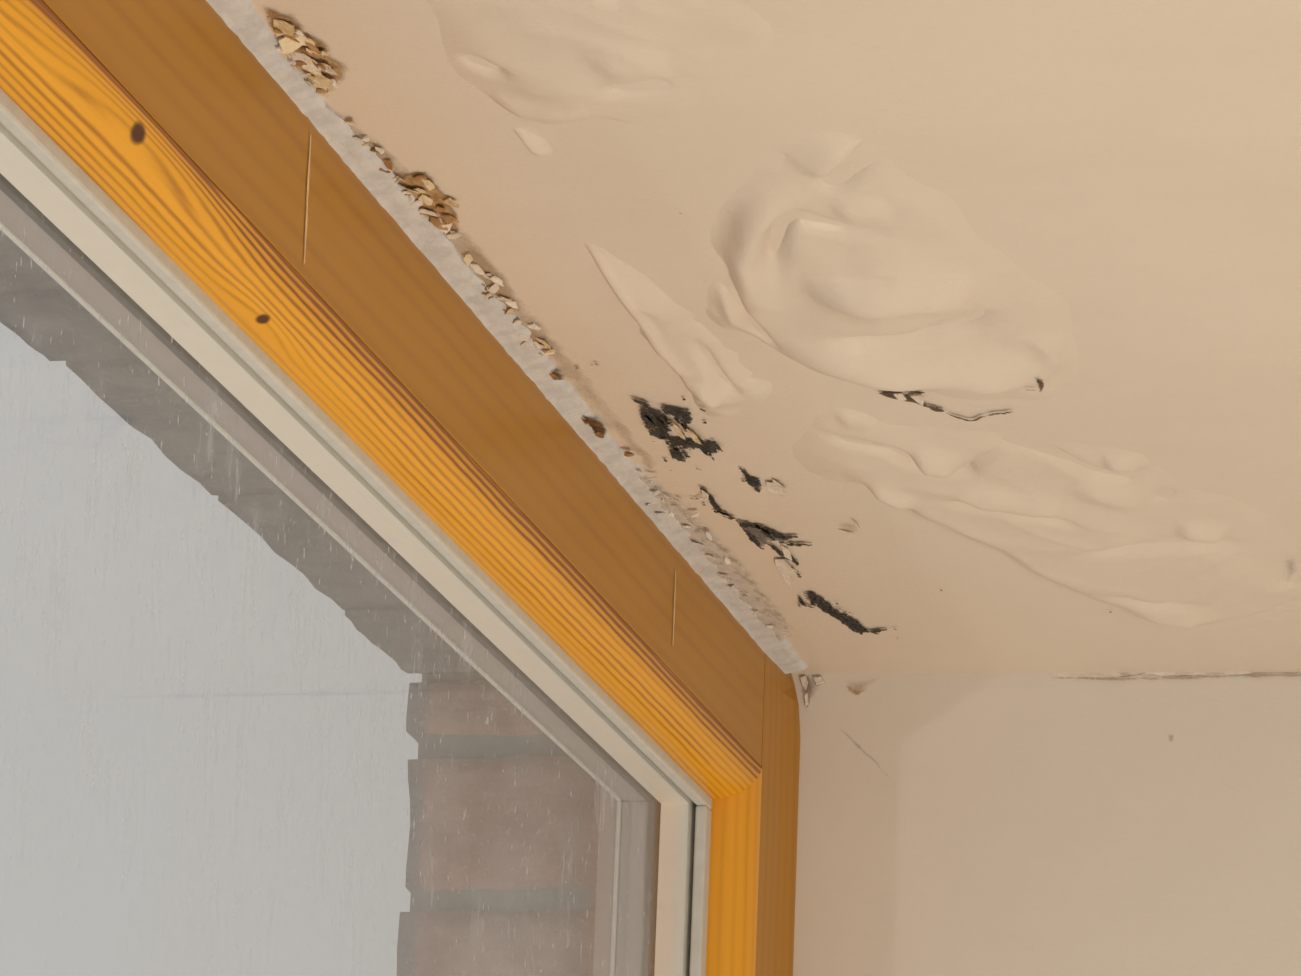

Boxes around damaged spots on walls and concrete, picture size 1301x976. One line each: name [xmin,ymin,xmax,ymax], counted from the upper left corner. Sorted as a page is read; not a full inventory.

spalling [267,11,343,94]
peeling [345,121,461,239]
peeling [463,253,555,356]
damp [631,398,723,471]
damp [739,468,788,497]
damp [690,487,899,638]